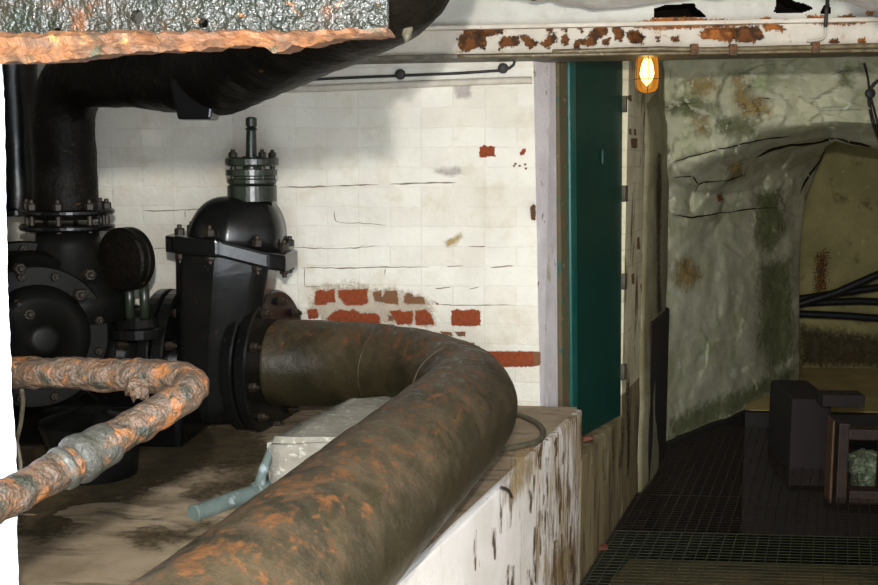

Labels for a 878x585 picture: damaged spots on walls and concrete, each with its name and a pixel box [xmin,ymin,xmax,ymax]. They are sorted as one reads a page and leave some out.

spalling [654,4,706,18]
corrosion [456,16,787,52]
peeling [479,145,496,158]
crack [673,136,871,194]
crack [678,207,777,219]
damp [755,189,785,251]
damp [810,248,832,292]
peeling [307,288,541,367]
damp [669,259,878,438]